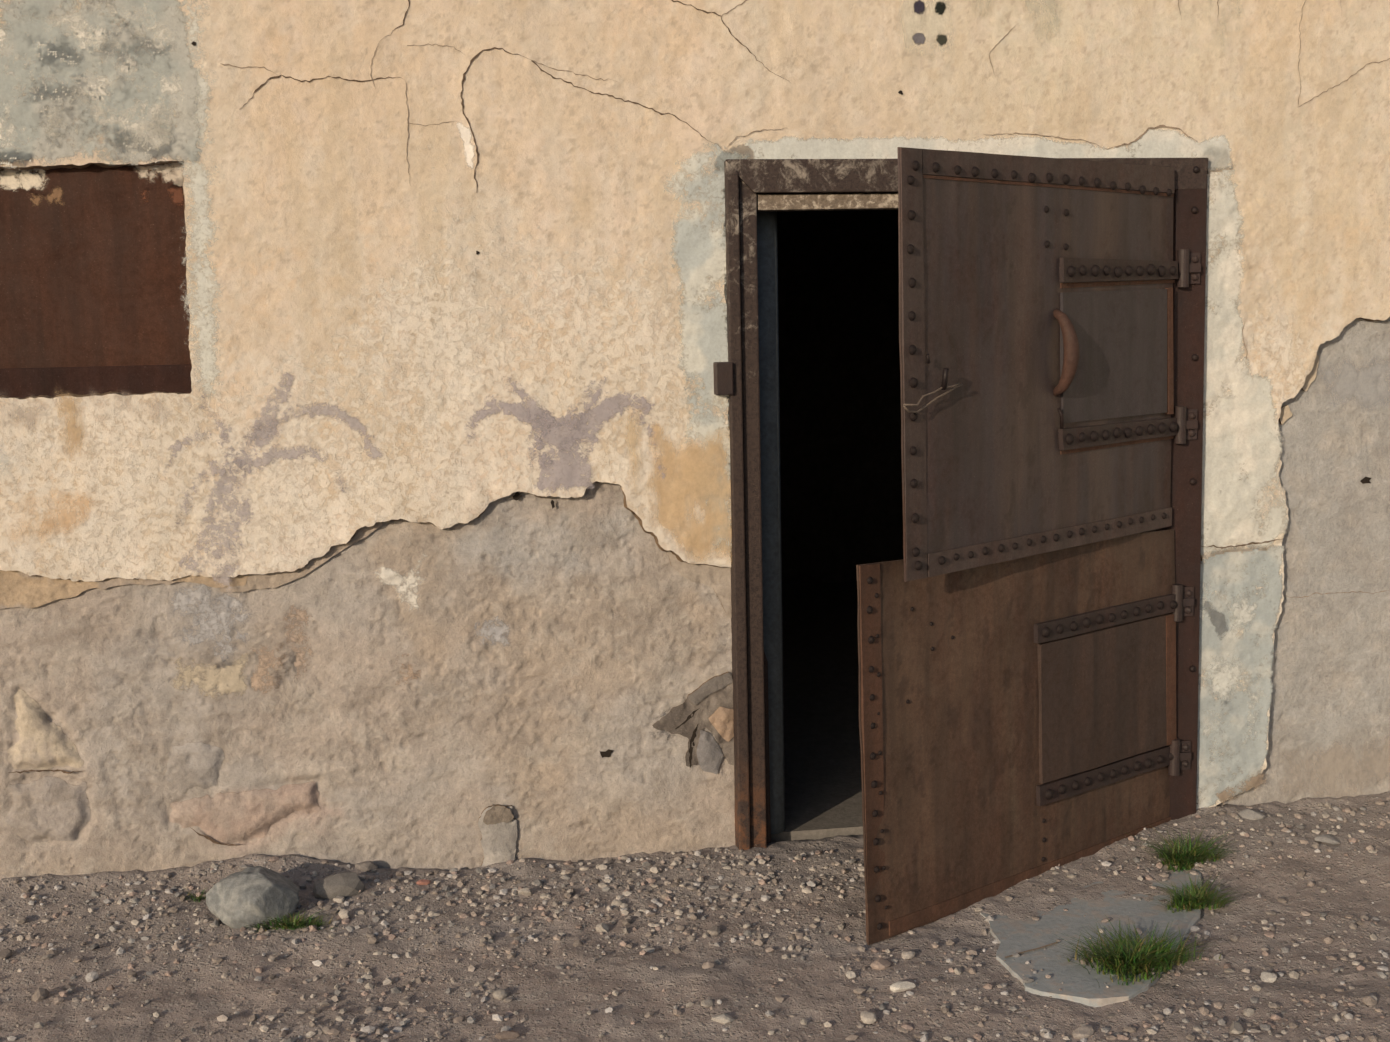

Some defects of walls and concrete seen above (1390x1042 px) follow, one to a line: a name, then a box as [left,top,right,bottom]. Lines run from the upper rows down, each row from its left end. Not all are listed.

peeling [0,3,183,190]
crack [220,0,726,186]
crack [671,0,781,77]
crack [1298,0,1390,107]
rust [30,188,63,205]
rust [167,188,185,206]
rust [1060,280,1175,414]
flaking render [0,125,1390,879]
rust [1166,614,1176,745]